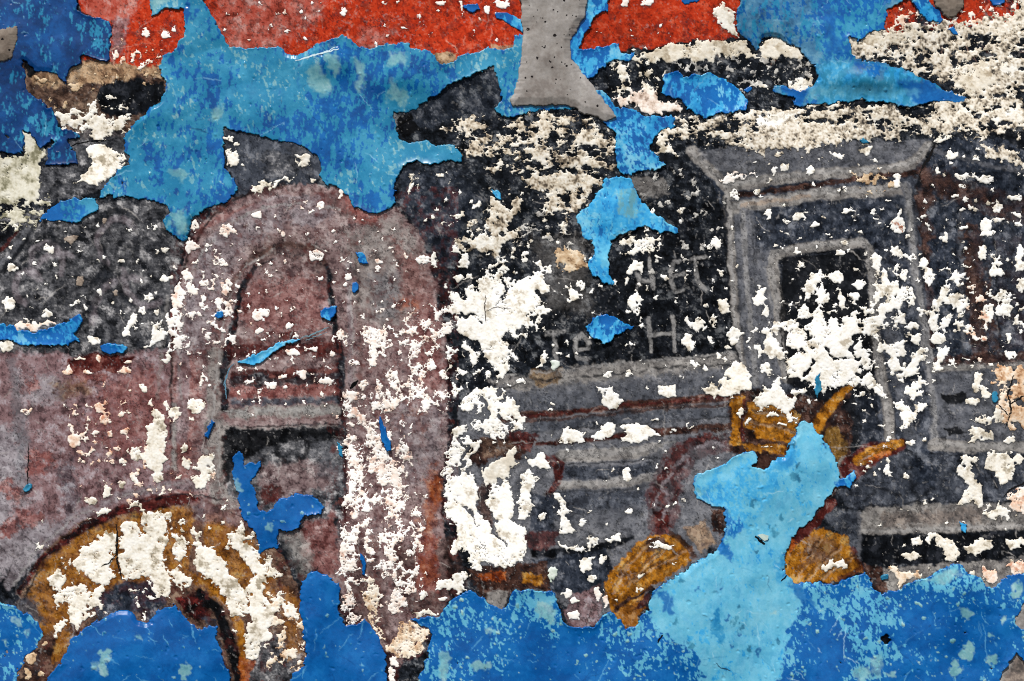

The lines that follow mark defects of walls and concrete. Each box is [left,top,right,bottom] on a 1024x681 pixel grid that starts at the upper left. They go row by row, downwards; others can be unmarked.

flaking render [34,26,176,186]
flaking render [0,130,107,353]
peeling [24,110,735,681]
flaking render [608,0,1024,590]
crack [101,524,122,580]